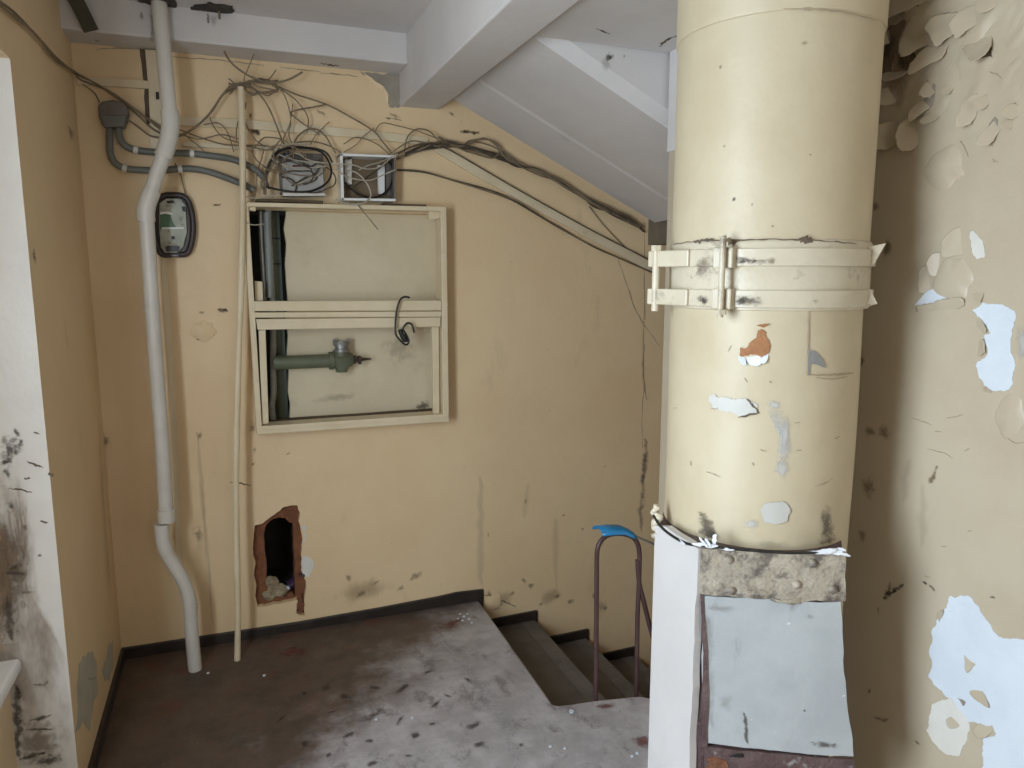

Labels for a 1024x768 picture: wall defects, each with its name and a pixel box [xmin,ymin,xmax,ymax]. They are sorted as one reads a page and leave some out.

spalling [360,71,400,108]
peeling [877,0,995,152]
crack [618,235,659,411]
peeling [738,324,771,366]
peeling [915,227,1024,393]
peeling [708,394,759,418]
damp [3,430,22,475]
spalling [253,505,314,613]
peeling [748,501,791,527]
damp [14,687,55,764]
peeling [75,641,113,733]
peeling [926,595,1024,768]